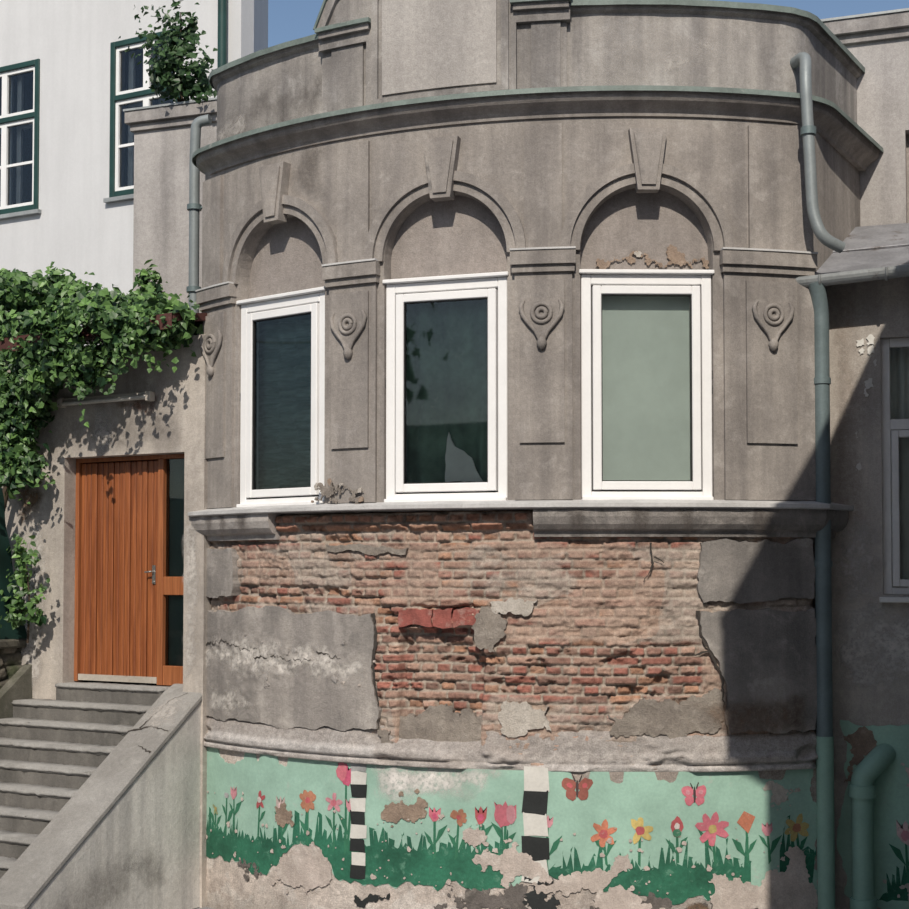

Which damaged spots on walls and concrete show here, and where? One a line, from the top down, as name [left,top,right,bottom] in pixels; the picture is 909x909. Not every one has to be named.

spalling [596,244,709,269]
spalling [205,478,813,755]
crack [690,611,728,734]
crack [127,693,187,753]
peeling [843,726,877,783]
peeling [377,789,428,834]
peeling [233,803,344,894]
peeling [434,823,672,909]
peeling [685,843,818,909]